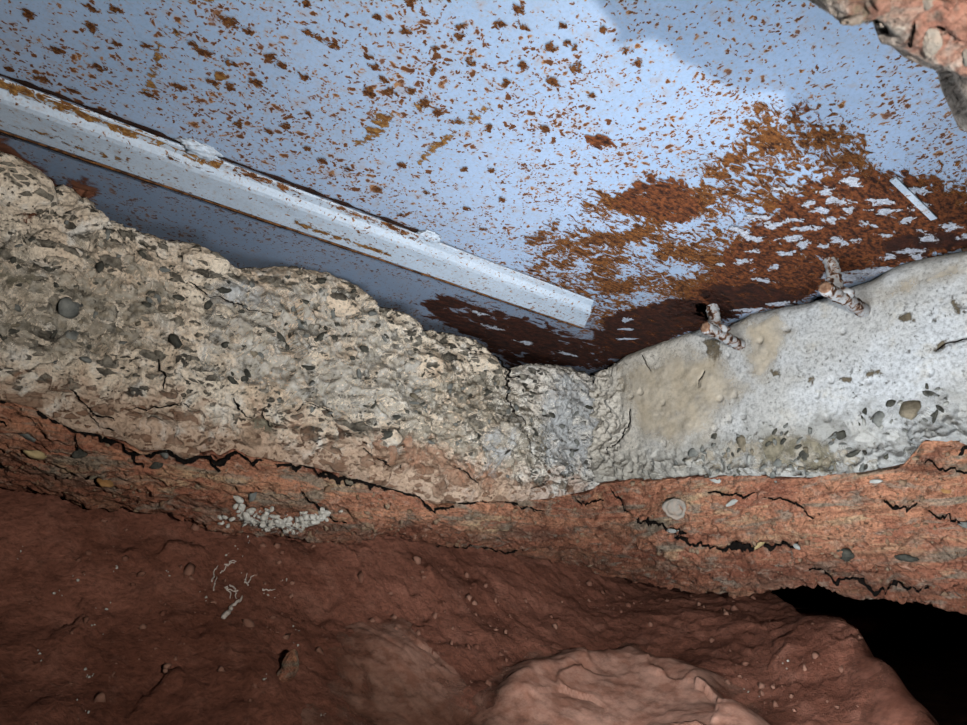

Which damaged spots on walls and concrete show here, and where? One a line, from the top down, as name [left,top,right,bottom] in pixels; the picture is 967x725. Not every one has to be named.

corrosion [140,19,239,100]
corrosion [543,22,583,76]
corrosion [0,66,301,195]
corrosion [362,54,495,169]
corrosion [0,97,967,370]
peeling [616,316,639,340]
crack [36,348,548,524]
spalling [674,423,889,483]
spalling [858,383,949,441]
crack [575,490,799,553]
crack [708,491,820,519]
crack [884,499,967,524]